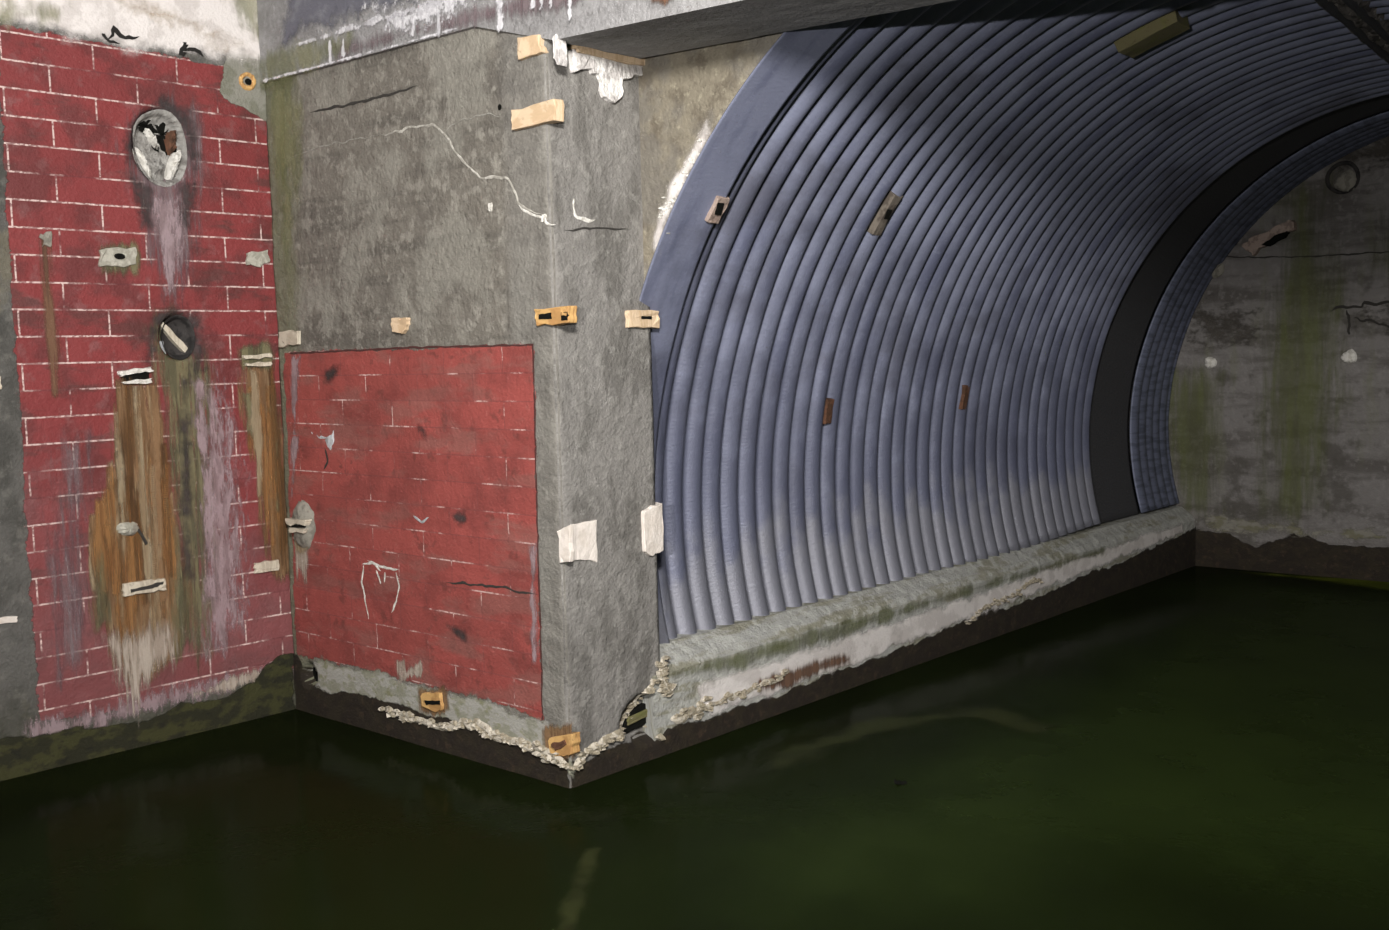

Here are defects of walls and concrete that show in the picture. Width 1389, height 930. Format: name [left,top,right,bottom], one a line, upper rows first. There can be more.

damp [263,0,577,83]
crack [286,86,625,231]
crack [1332,300,1389,334]
corrosion [238,366,290,580]
corrosion [88,380,192,714]
crack [446,581,538,595]
peeling [964,577,1044,625]
peeling [378,655,789,771]